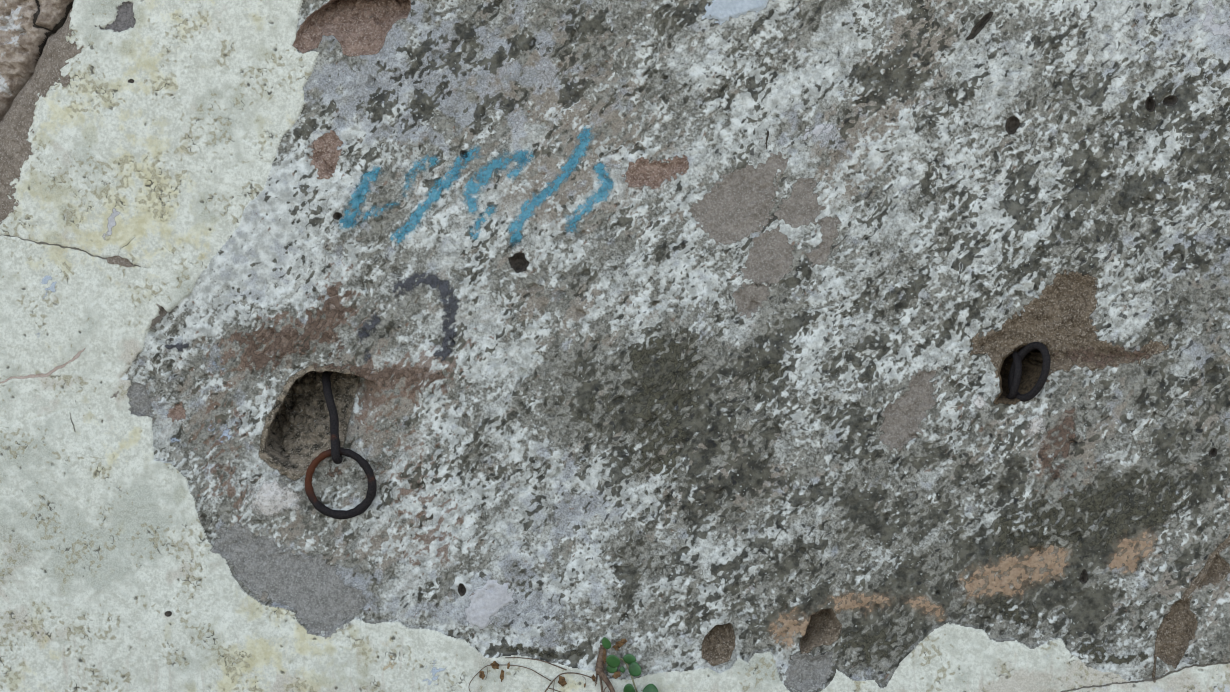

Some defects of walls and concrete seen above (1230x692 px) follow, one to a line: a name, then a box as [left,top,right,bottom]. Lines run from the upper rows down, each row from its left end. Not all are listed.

peeling [702,0,769,25]
flaking render [311,130,343,179]
flaking render [688,151,788,245]
crack [4,235,141,267]
flaking render [739,226,795,287]
flaking render [970,269,1137,378]
flaking render [879,369,937,451]
flaking render [312,455,368,511]
flaking render [210,523,371,638]
peeling [465,579,514,629]
crack [1061,534,1230,692]
flaking render [784,652,835,692]